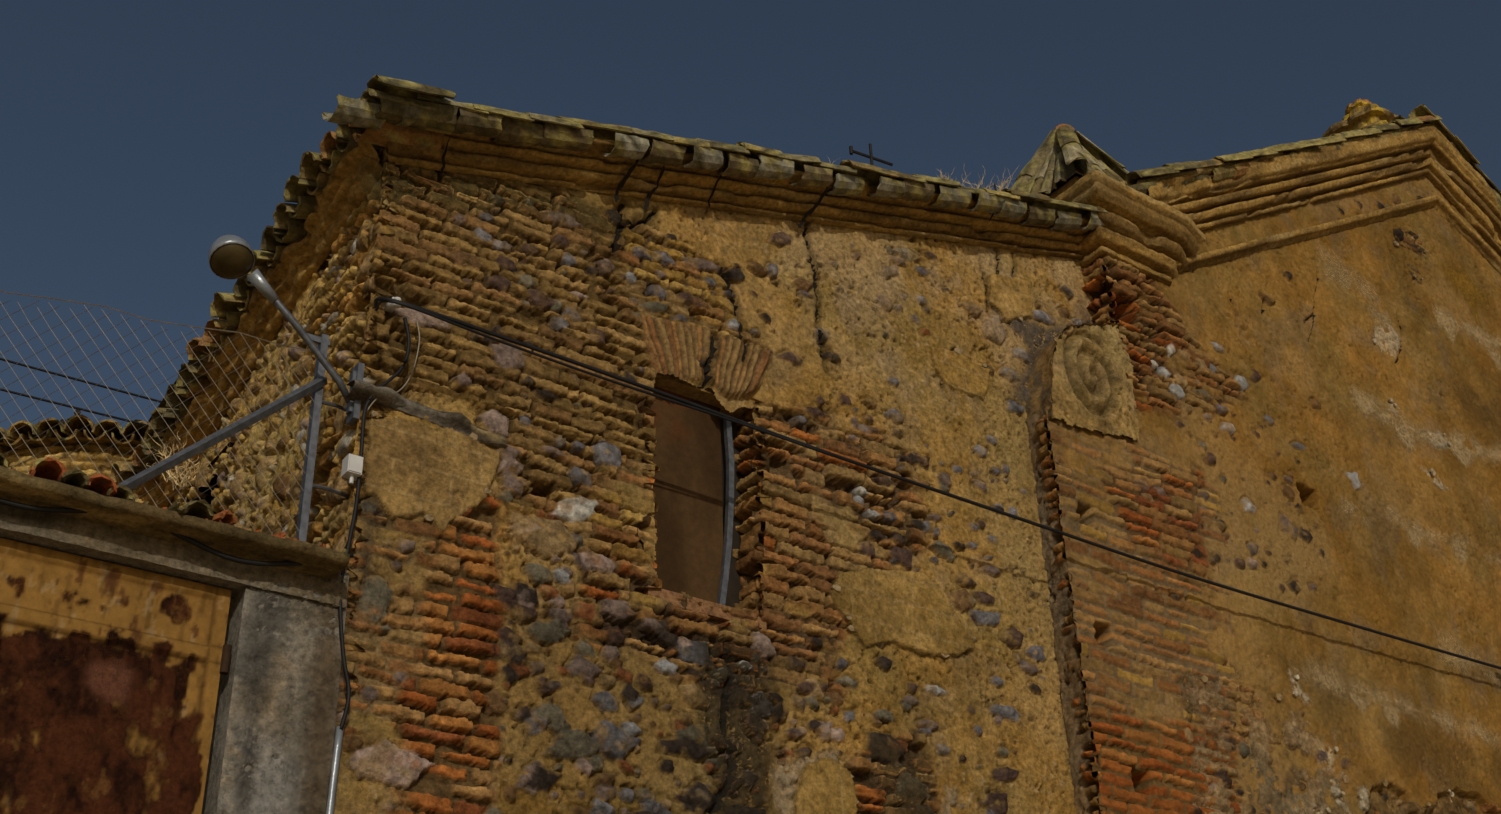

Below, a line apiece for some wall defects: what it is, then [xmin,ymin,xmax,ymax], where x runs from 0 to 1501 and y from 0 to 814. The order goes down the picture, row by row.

crack [611,146,665,255]
crack [708,152,728,208]
crack [797,170,835,363]
rust [7,576,25,596]
rust [160,594,191,624]
rust [0,613,202,814]
crack [708,647,738,814]
flaking render [1175,660,1501,814]